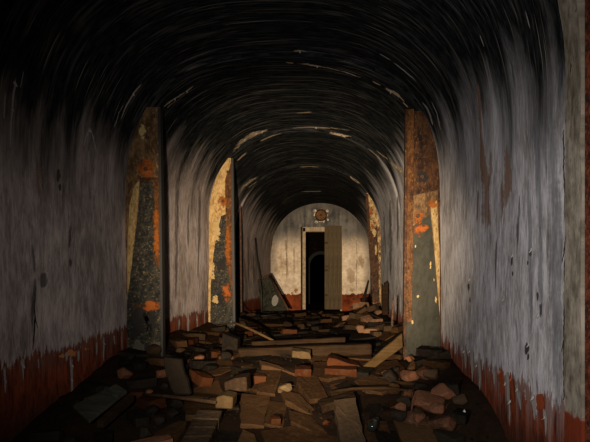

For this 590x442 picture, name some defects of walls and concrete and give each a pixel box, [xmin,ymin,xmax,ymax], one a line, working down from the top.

spalling [235,129,281,149]
corrosion [415,211,428,237]
corrosion [144,301,159,311]